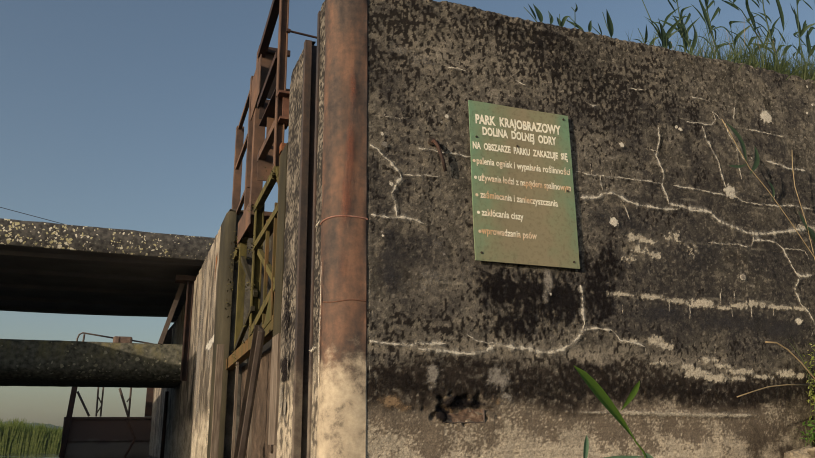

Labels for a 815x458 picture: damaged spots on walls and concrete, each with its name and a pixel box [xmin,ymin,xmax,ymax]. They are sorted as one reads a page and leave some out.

crack [370,144,438,223]
crack [576,97,814,334]
crack [369,285,646,370]
damp [371,357,804,404]